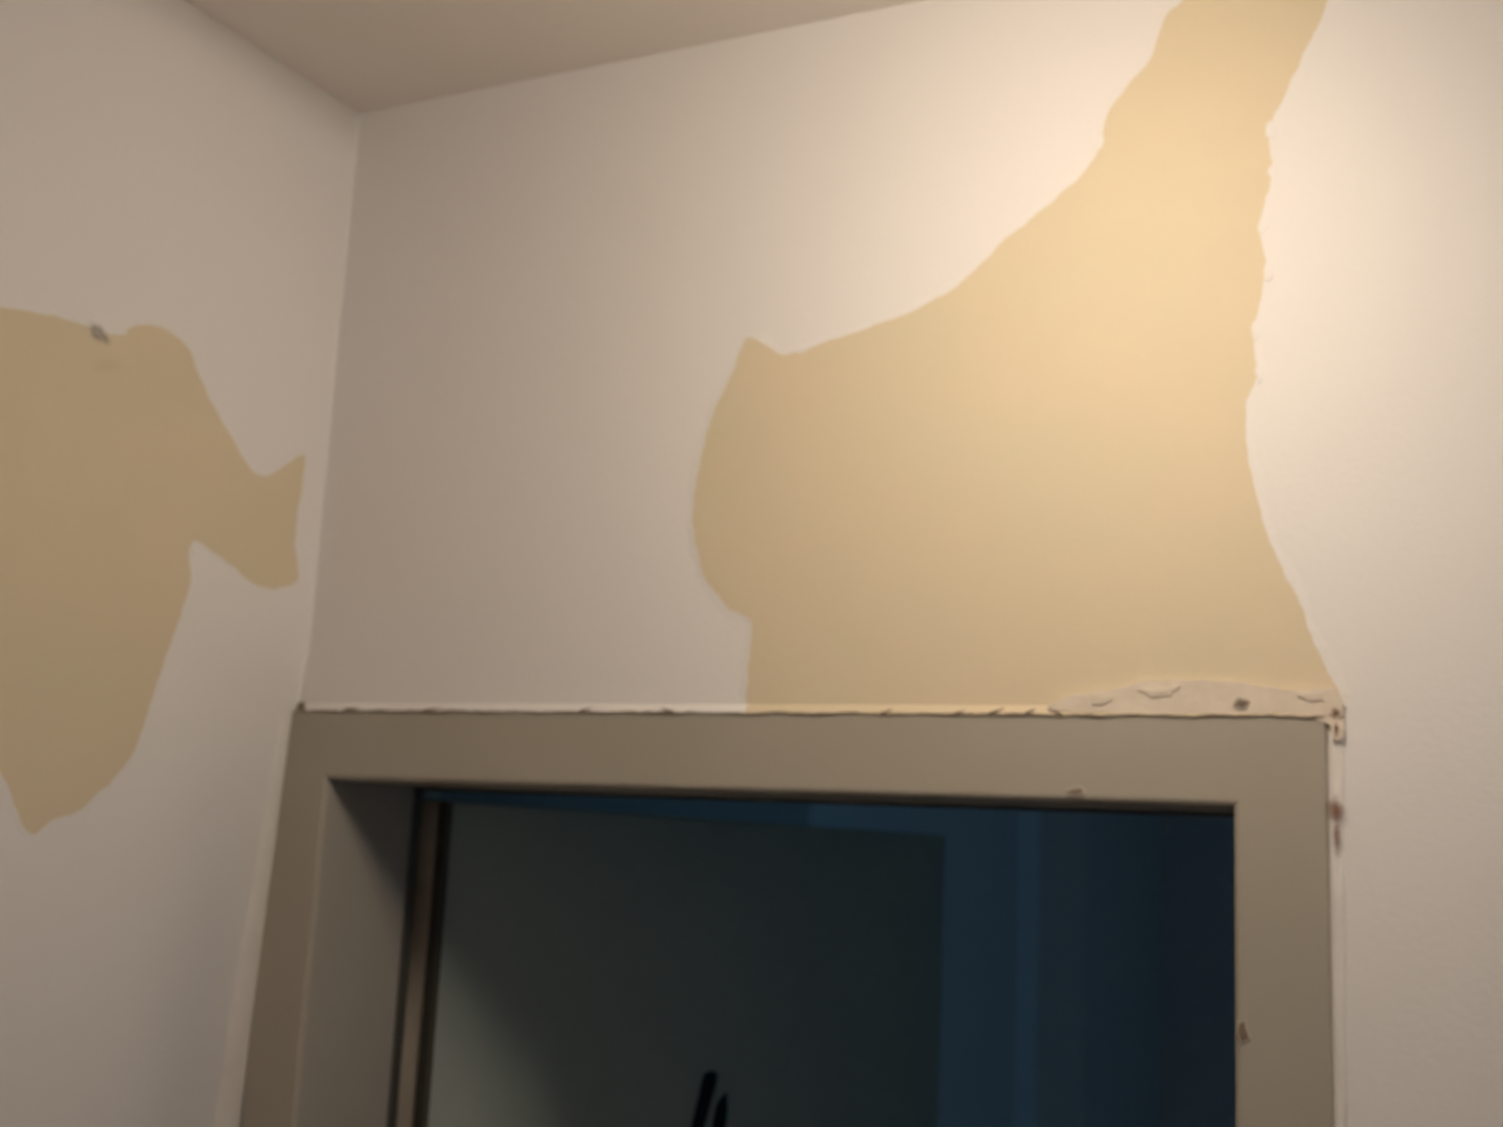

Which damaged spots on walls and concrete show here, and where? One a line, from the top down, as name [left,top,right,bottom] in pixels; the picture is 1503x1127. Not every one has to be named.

peeling [0,300,309,841]
peeling [686,0,1350,741]